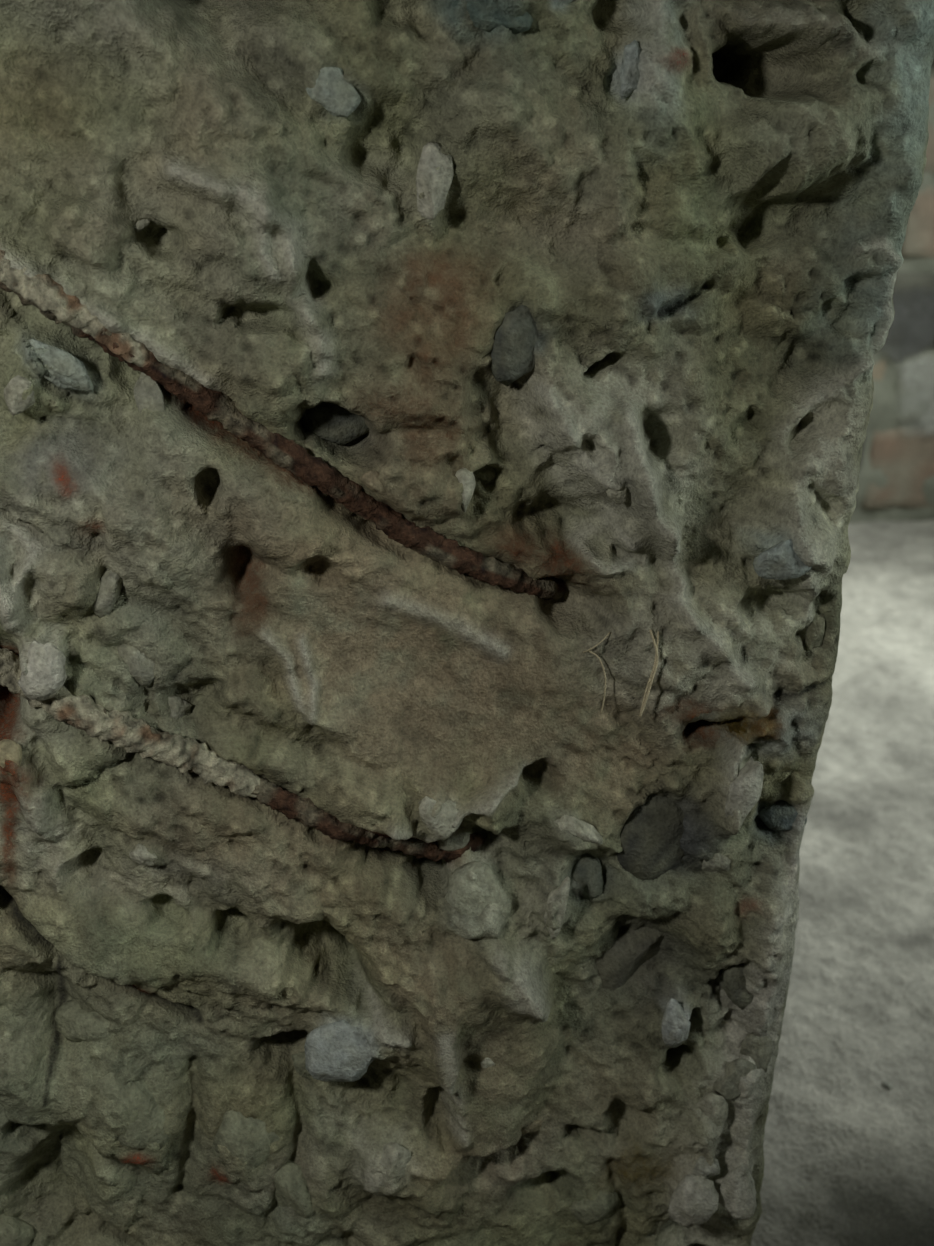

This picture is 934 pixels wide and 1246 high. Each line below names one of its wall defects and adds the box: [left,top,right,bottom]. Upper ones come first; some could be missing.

spalling [416,142,454,220]
spalling [725,175,896,405]
spalling [733,402,862,600]
spalling [0,288,463,843]
spalling [243,494,645,817]
spalling [805,613,825,652]
corrosion [0,687,20,741]
corrosion [0,760,24,870]
spalling [554,815,603,846]
spalling [759,800,798,831]
spalling [444,861,511,918]
spalling [714,964,754,1010]